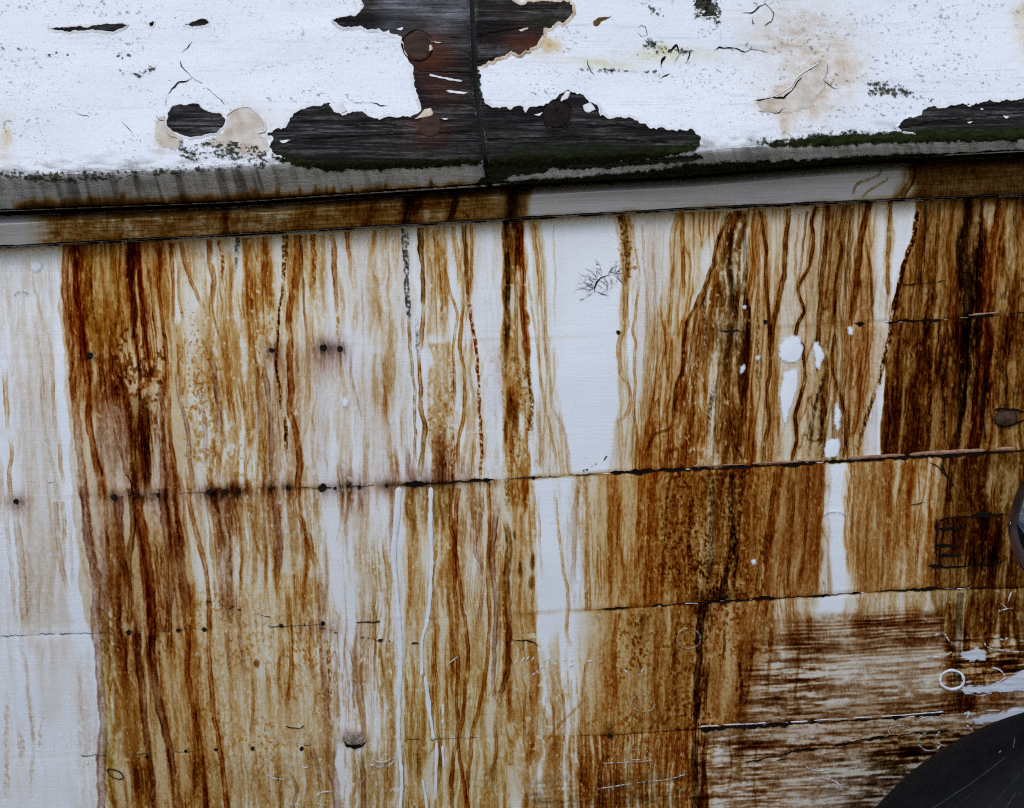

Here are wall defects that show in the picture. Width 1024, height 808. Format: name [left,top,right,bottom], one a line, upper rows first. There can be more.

peeling [47,21,129,34]
peeling [155,0,704,168]
crack [755,61,834,114]
leakage [748,129,868,148]
peeling [894,95,1024,140]
rust [15,166,539,808]
rust [579,156,1024,808]